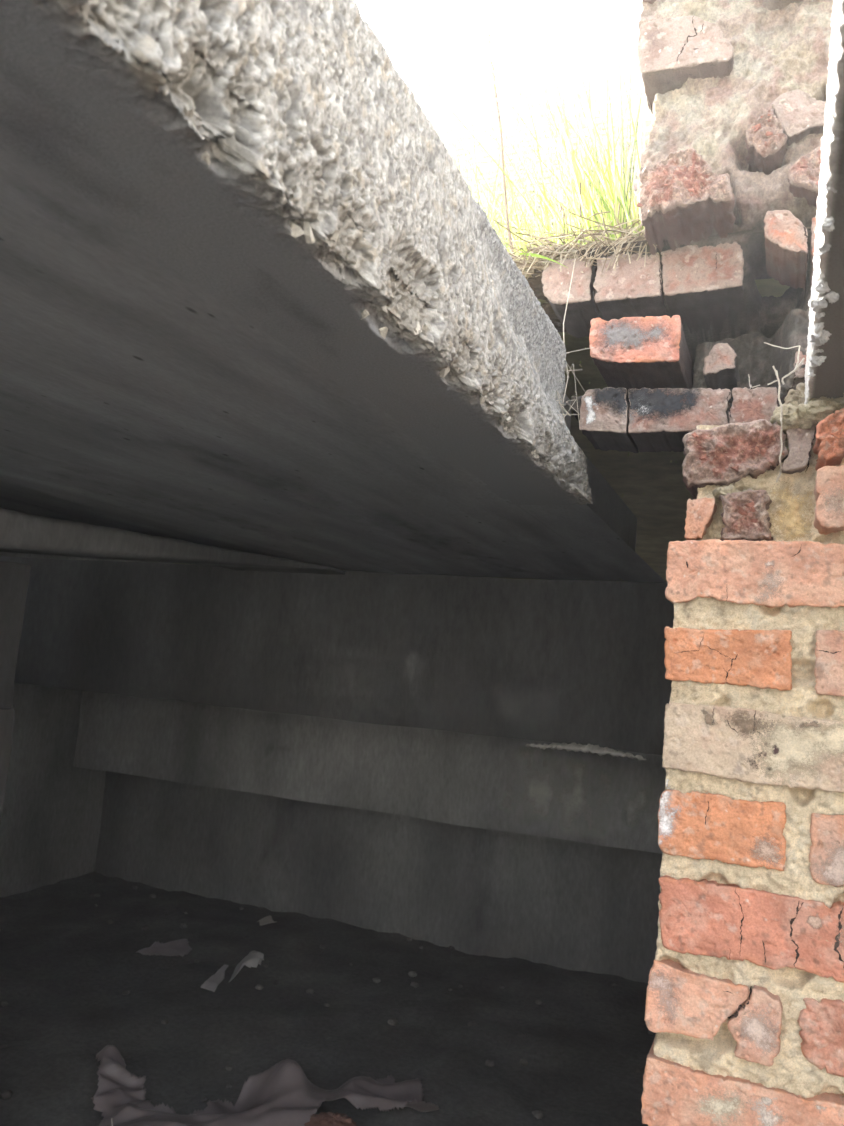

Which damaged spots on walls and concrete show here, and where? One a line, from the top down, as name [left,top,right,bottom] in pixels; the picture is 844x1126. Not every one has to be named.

crack [677,16,704,61]
spalling [0,0,593,505]
crack [677,639,738,679]
spalling [525,742,646,761]
crack [729,889,766,963]
crack [790,902,804,968]
crack [834,908,844,968]
crack [723,986,752,1019]